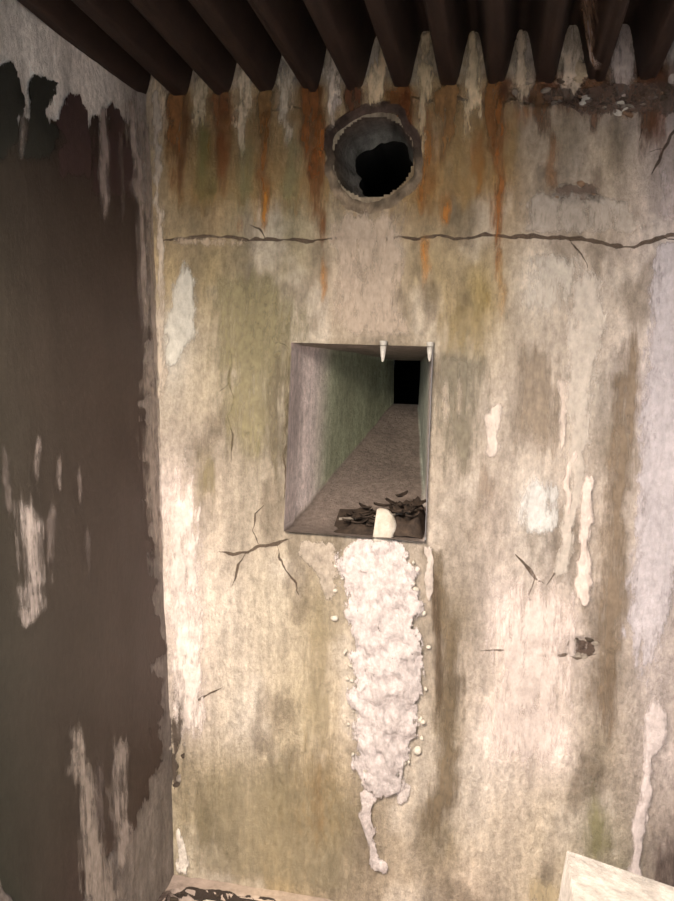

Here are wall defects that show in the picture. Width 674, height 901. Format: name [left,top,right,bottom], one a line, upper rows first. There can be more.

rust [300,86,325,231]
crack [163,225,674,268]
rust [472,79,512,243]
spalling [511,78,674,118]
rust [517,64,674,180]
crack [639,130,674,175]
peeling [0,61,186,901]
crack [219,342,299,595]
damp [516,242,674,735]
damp [298,538,458,874]
damp [486,586,576,761]
damp [628,700,668,876]